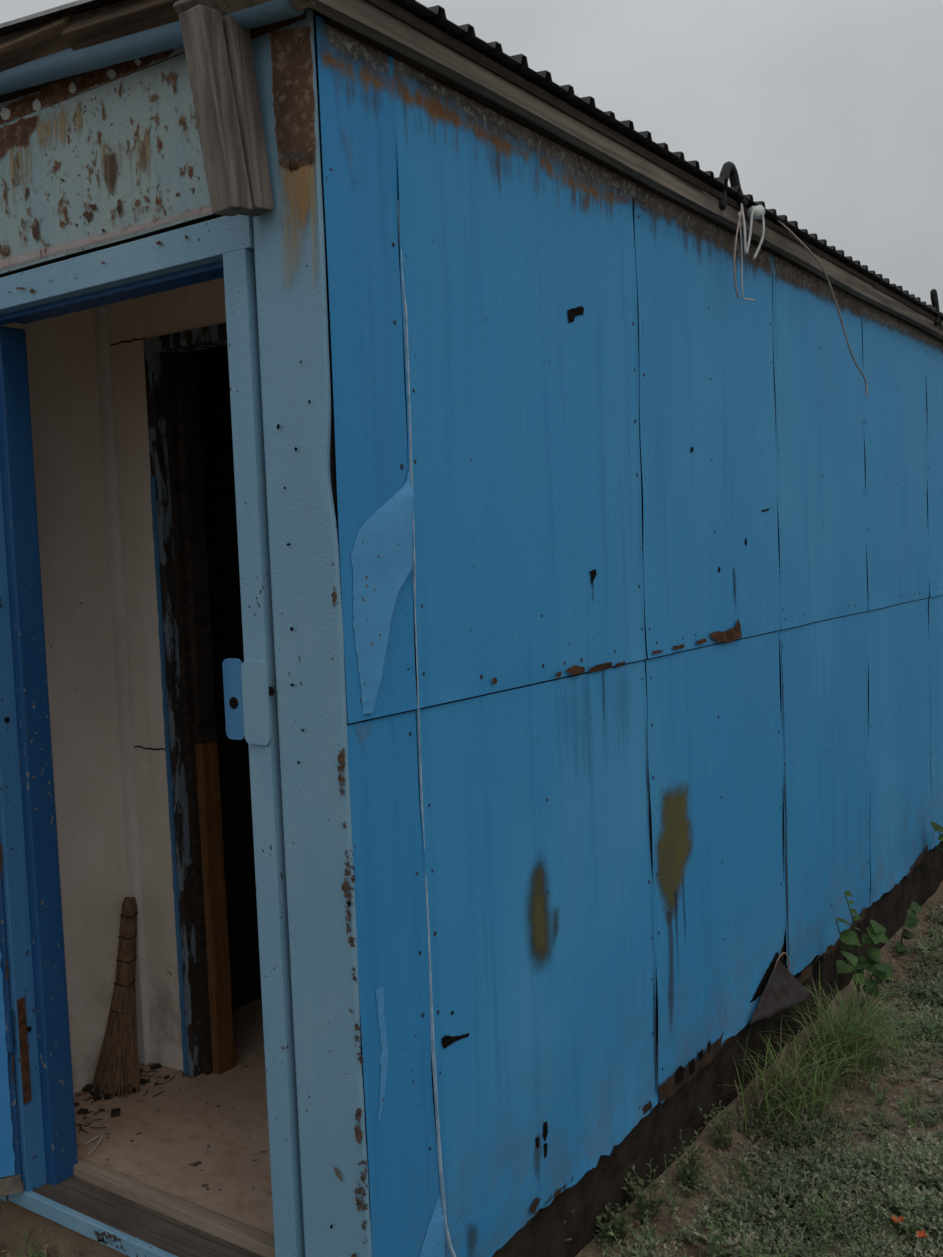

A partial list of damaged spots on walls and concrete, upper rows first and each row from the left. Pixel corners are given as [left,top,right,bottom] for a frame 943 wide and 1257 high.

rust [0,49,204,268]
rust [270,26,627,285]
peeling [337,749,345,796]
peeling [341,844,356,947]
leakage [532,869,558,961]
leakage [658,789,692,941]
peeling [349,1009,364,1065]
peeling [354,1109,363,1145]
peeling [334,1160,368,1257]